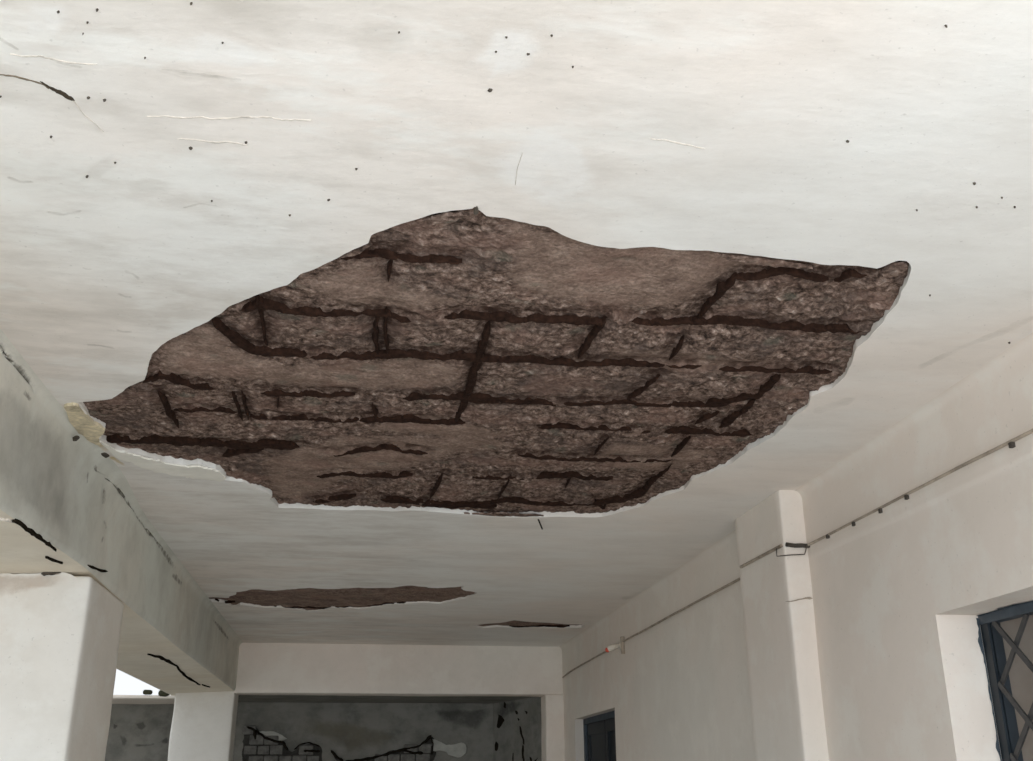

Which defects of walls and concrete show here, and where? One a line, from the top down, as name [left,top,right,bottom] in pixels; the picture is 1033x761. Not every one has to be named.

crack [0,54,104,132]
crack [147,115,311,146]
spalling [64,206,909,517]
crack [0,518,63,576]
spalling [209,586,475,610]
spalling [479,620,579,628]
crack [147,653,210,688]
flaking render [242,725,436,761]